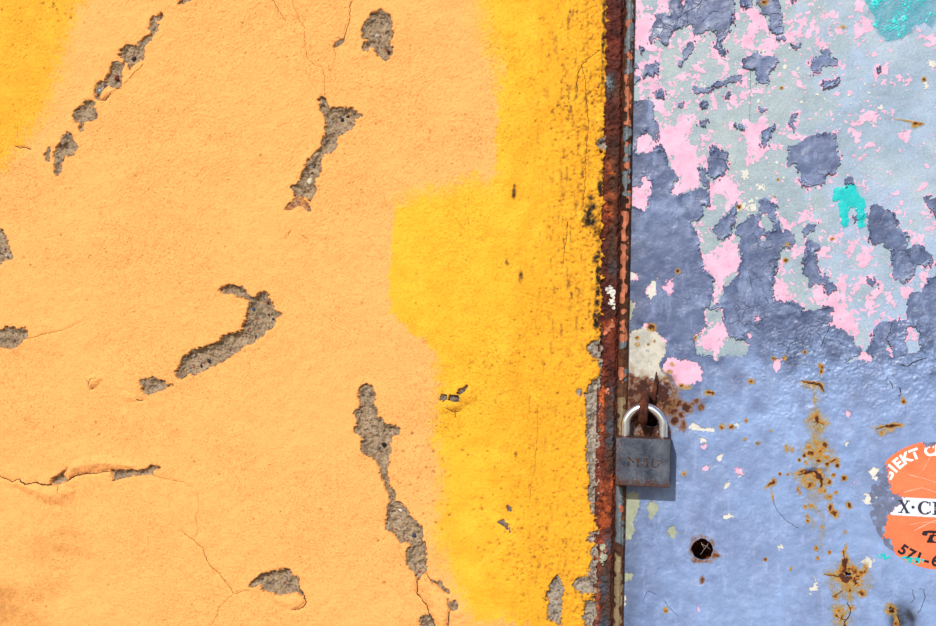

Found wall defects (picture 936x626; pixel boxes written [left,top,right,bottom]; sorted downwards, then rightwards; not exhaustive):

flaking render [44,13,163,176]
flaking render [284,97,363,212]
peeling [576,0,936,515]
crack [0,471,110,490]
crack [153,462,243,626]
flaking render [140,284,282,395]
flaking render [353,384,458,611]
flaking render [546,486,659,626]
corrosion [627,362,715,436]
corrosion [764,363,852,518]
corrosion [825,531,868,626]
corrosion [885,603,900,626]